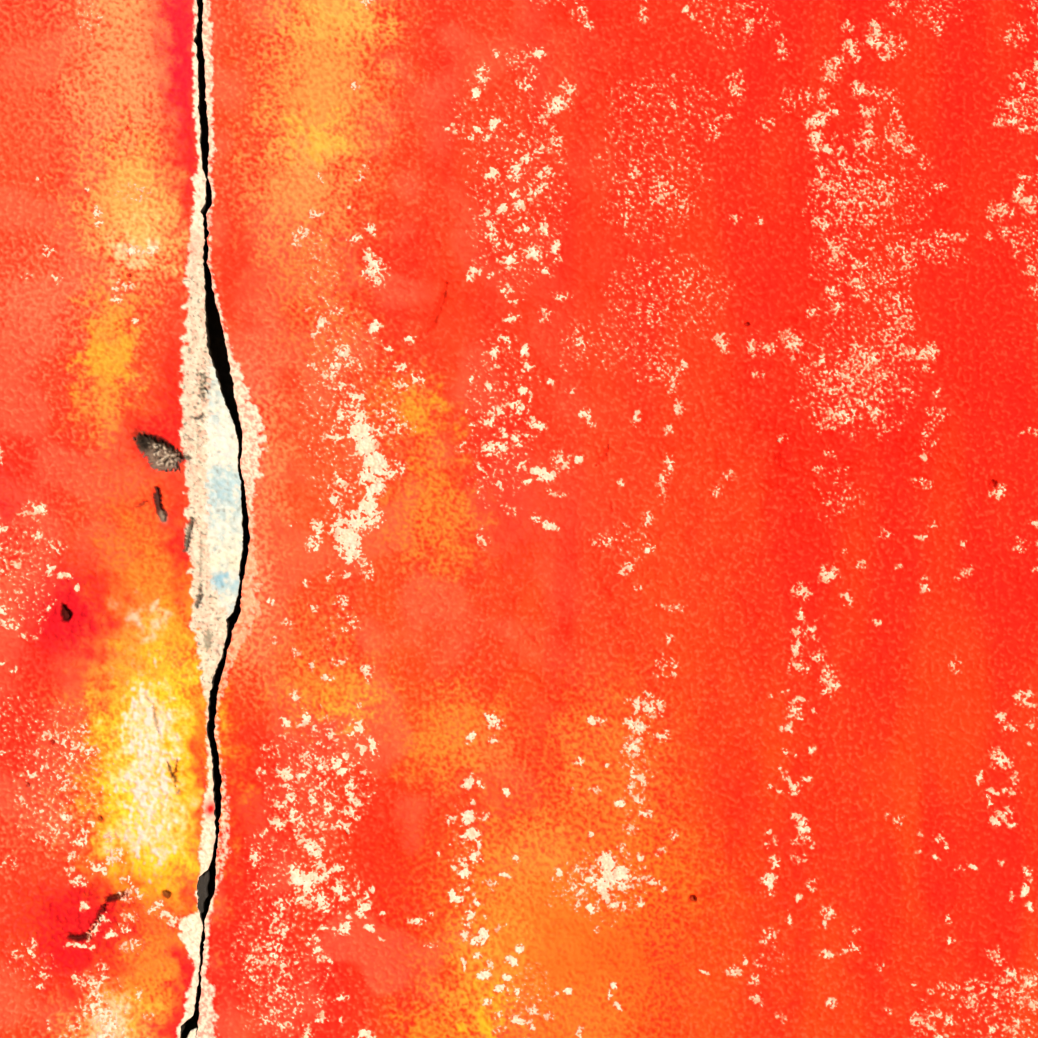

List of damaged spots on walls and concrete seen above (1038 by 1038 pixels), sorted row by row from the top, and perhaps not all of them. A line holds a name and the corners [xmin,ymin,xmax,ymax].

flaking render [0,0,275,1038]
crack [180,0,250,1038]